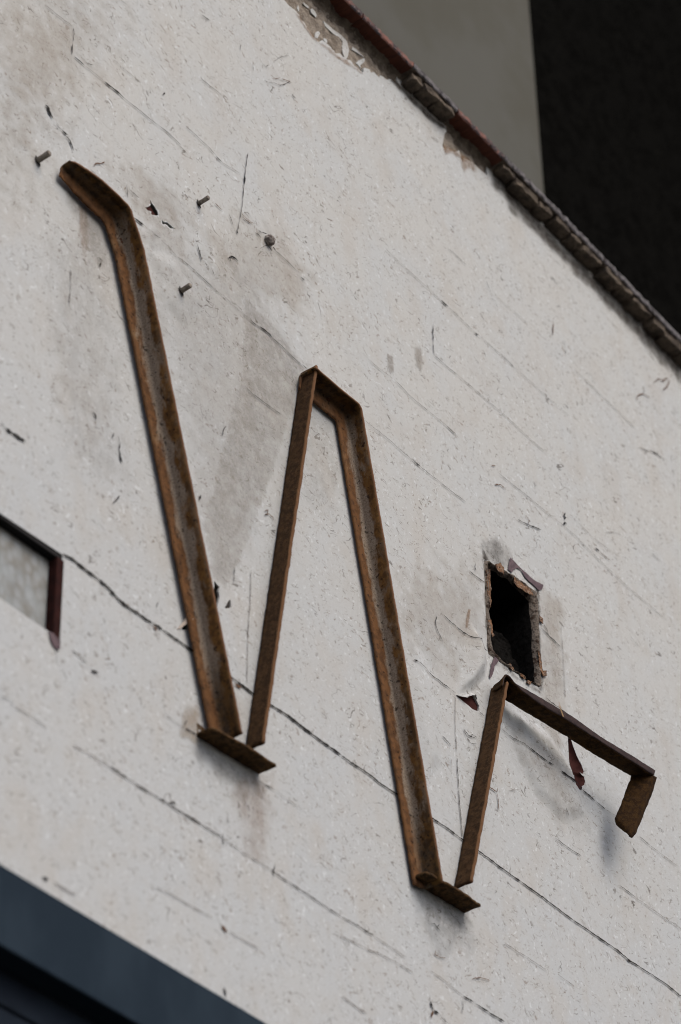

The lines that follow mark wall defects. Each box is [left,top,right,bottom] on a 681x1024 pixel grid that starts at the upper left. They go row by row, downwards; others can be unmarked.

spalling [285,0,396,81]
crack [64,554,193,652]
peeling [508,558,543,590]
crack [231,676,398,795]
crack [512,737,616,816]
crack [74,745,505,1022]
crack [432,817,681,996]